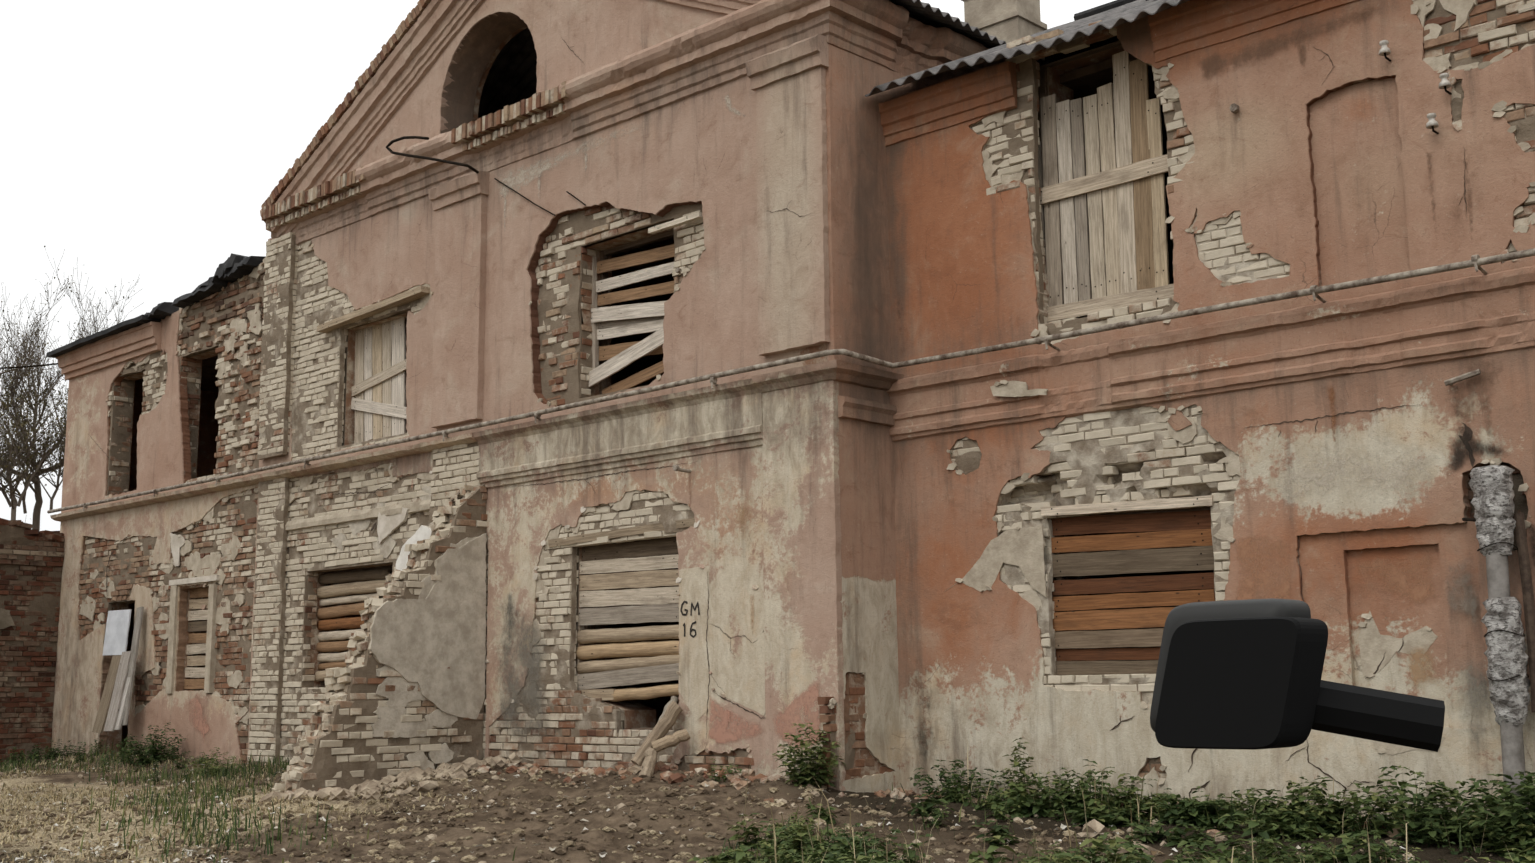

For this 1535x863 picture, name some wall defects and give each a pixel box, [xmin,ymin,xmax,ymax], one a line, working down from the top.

spalling [262,166,366,229]
spalling [528,204,706,407]
spalling [971,20,1179,345]
spalling [1152,63,1195,194]
spalling [1165,210,1290,287]
spalling [1411,0,1535,131]
spalling [77,257,266,764]
spalling [272,240,481,799]
spalling [482,490,766,774]
crack [706,573,766,738]
spalling [946,405,1241,709]
crack [1188,749,1209,799]